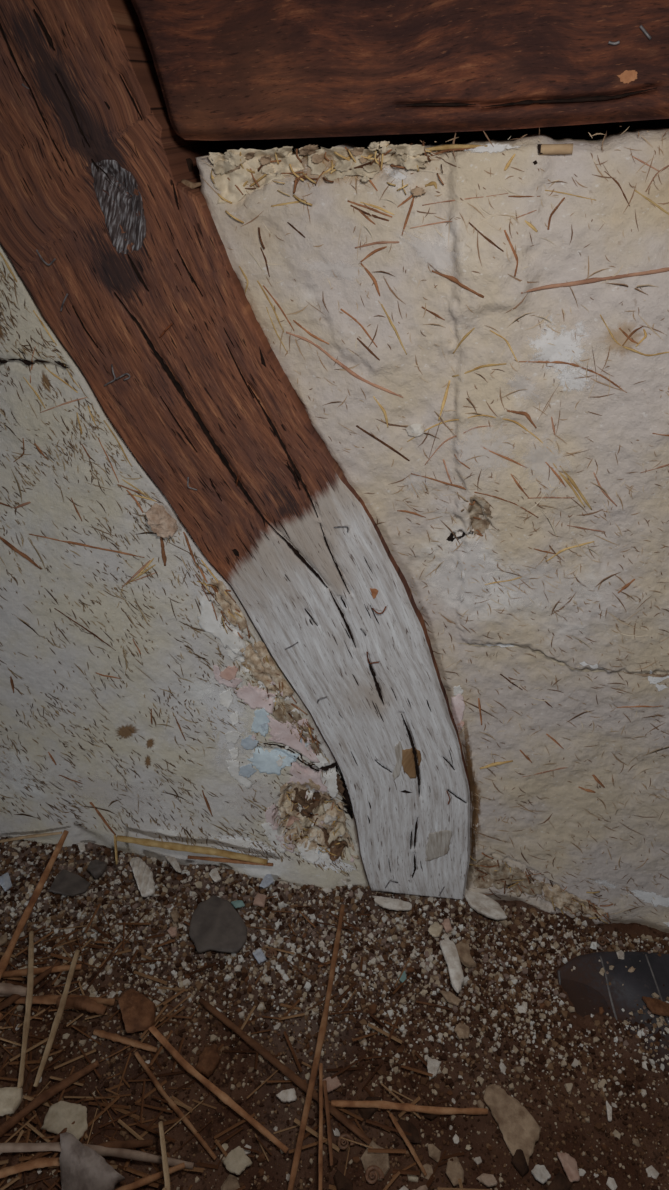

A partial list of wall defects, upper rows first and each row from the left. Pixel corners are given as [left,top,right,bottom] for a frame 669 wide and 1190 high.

spalling [208,141,444,224]
spalling [446,494,493,542]
peeling [197,578,359,867]